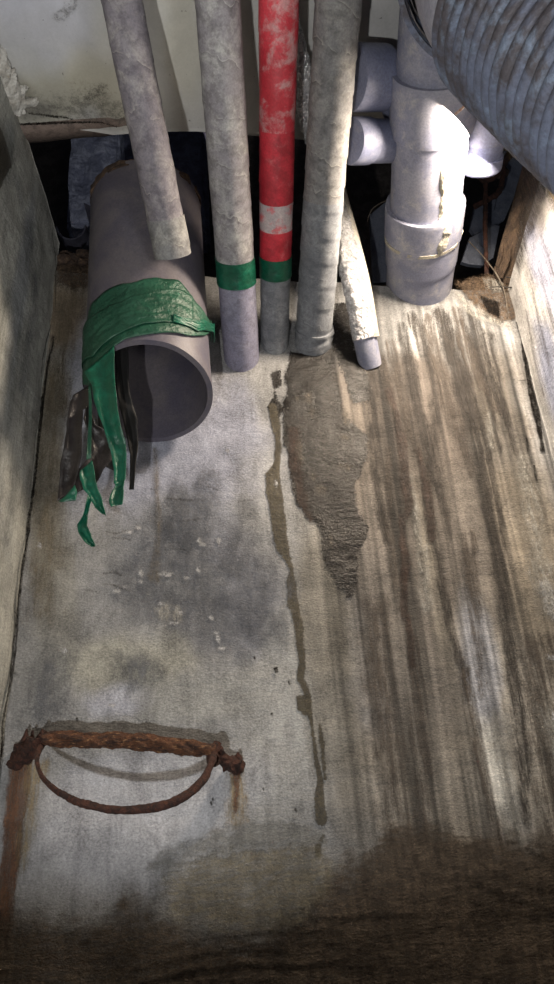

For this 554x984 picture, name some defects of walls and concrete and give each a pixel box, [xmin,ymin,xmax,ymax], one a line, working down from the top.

leakage [0,45,39,116]
leakage [0,128,12,188]
leakage [514,170,545,271]
leakage [0,302,554,984]
rust [0,761,47,939]
rust [228,774,247,826]